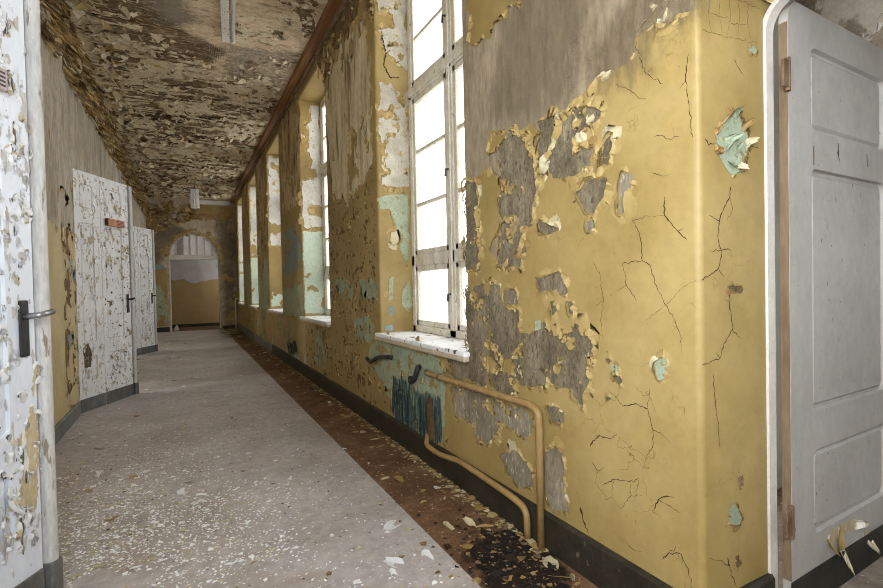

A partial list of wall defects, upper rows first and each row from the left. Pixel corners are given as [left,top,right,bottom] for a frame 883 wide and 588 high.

peeling [815,0,883,42]
peeling [714,105,760,179]
peeling [0,4,45,578]
peeling [40,0,695,518]
crack [593,187,741,456]
spalling [726,281,743,296]
crack [590,435,680,513]
peeling [726,502,744,533]